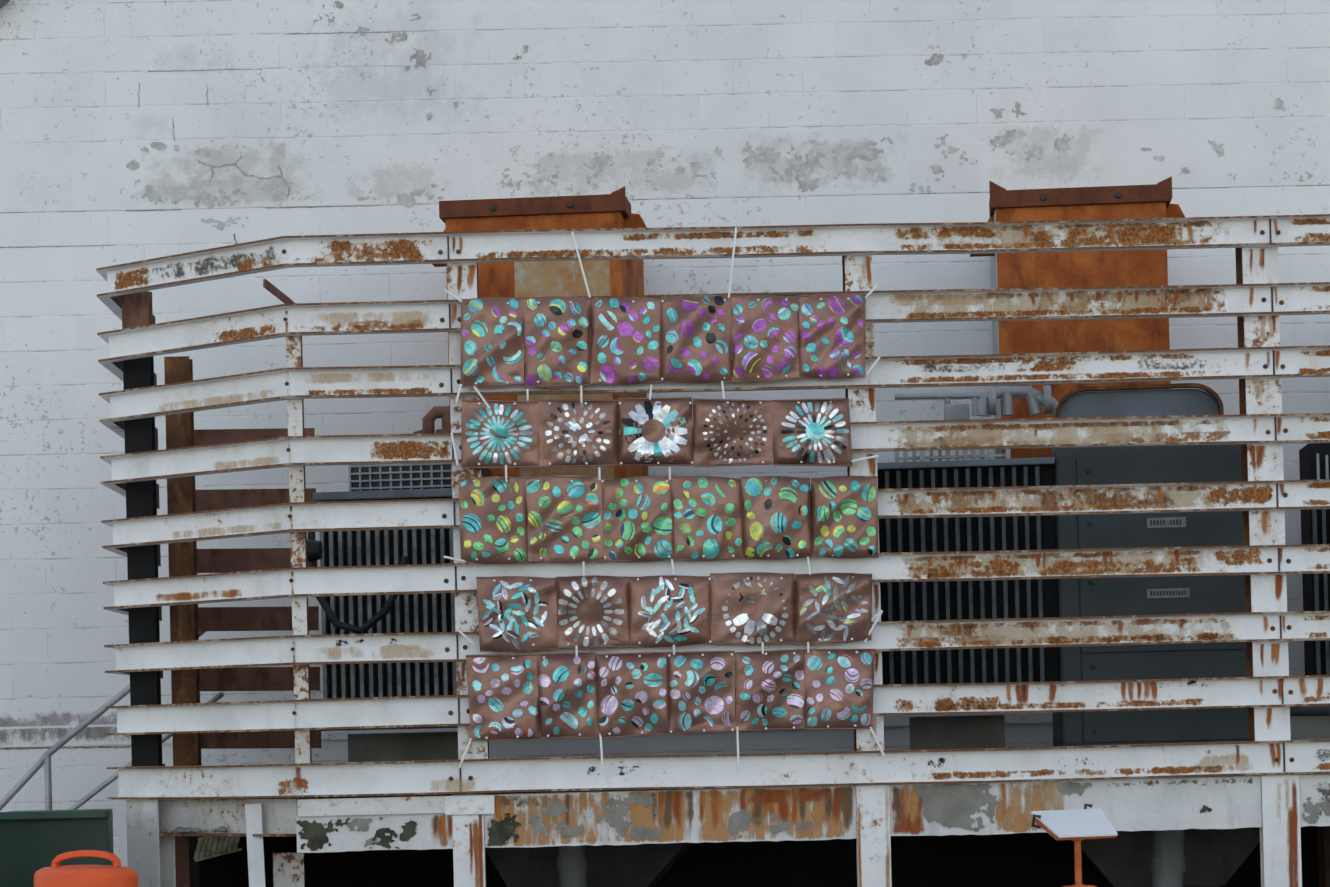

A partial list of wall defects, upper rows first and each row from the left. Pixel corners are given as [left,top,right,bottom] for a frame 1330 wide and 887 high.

crack [172,118,382,208]
rust [296,239,432,263]
rust [896,221,1220,250]
rust [891,484,1284,532]
rust [905,549,1263,579]
rust [896,681,1203,712]
spalling [1059,782,1092,797]
spalling [296,817,417,851]
spalling [487,793,662,846]
spalling [916,783,1006,832]
rust [1288,784,1298,887]
spalling [1302,797,1330,824]